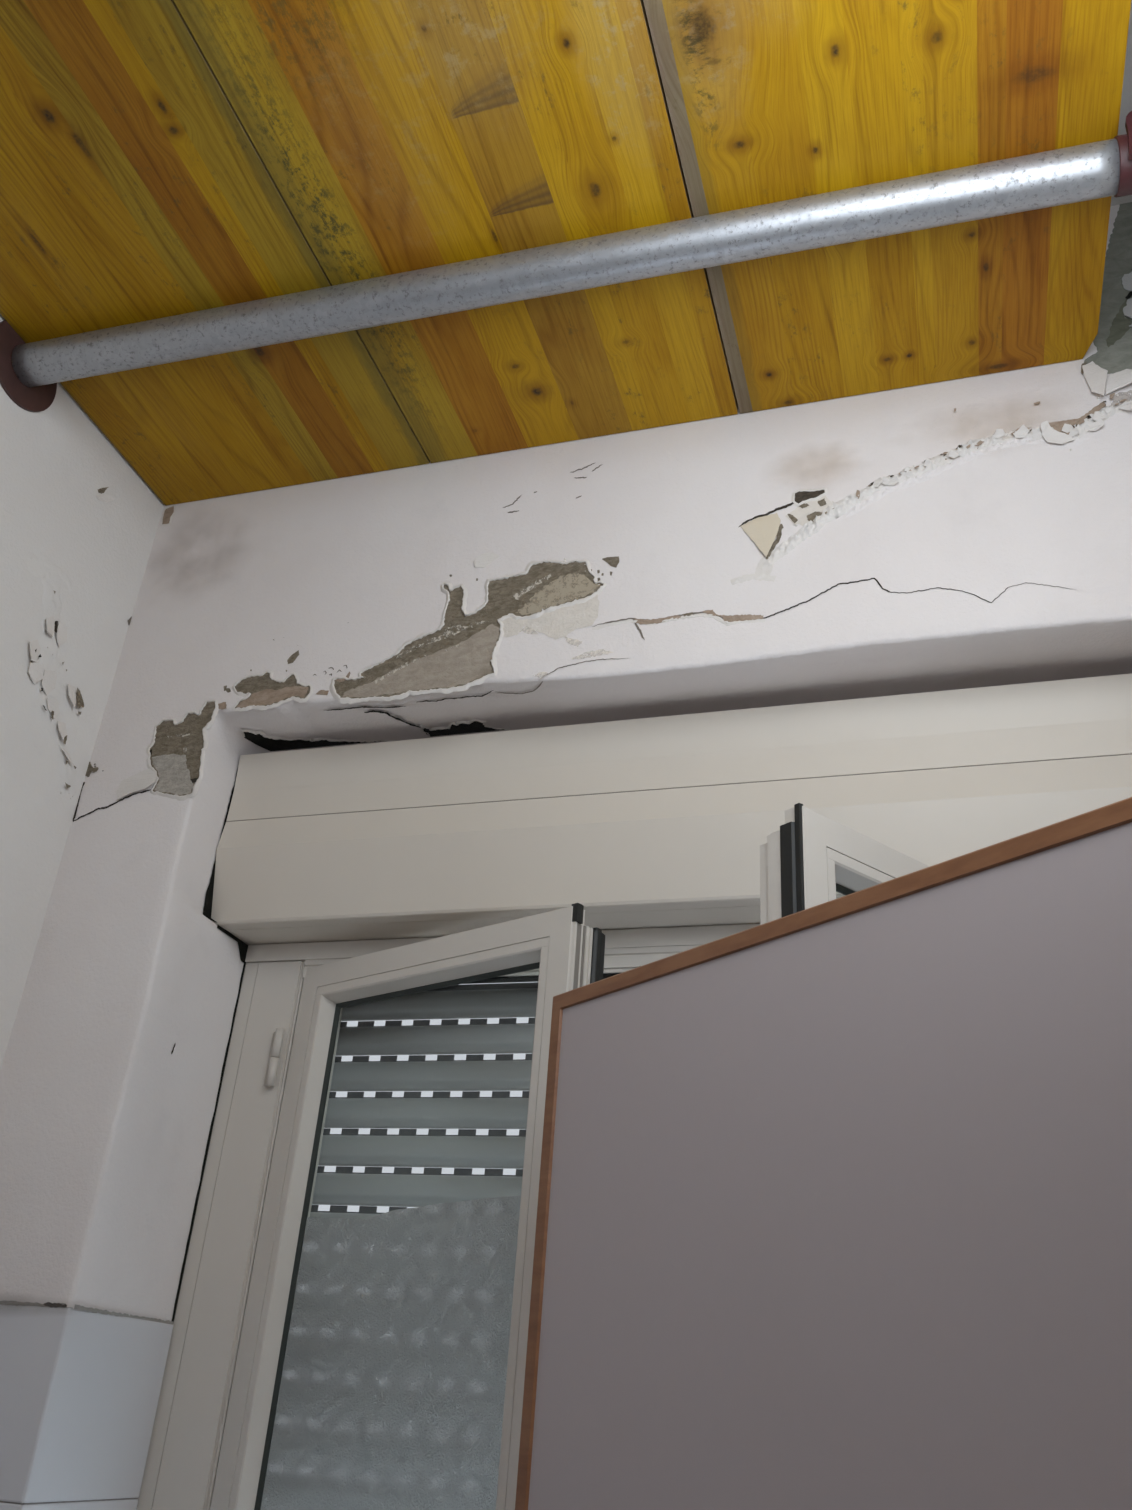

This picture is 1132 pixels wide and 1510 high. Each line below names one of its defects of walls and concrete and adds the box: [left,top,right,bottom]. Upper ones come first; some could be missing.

peeling [1084,202,1132,374]
flaking render [739,487,836,559]
flaking render [146,556,619,801]
crack [326,578,1076,735]
crack [74,768,157,821]